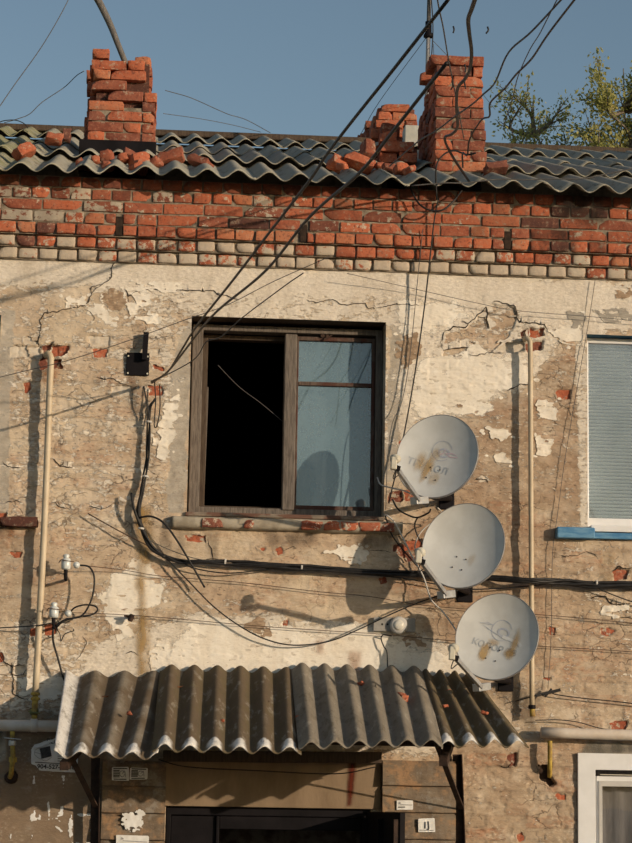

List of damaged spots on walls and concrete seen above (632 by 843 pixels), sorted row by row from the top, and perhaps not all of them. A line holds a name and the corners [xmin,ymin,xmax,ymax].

crack [31,263,238,347]
peeling [388,284,632,421]
peeling [147,383,183,460]
peeling [479,426,515,442]
peeling [485,452,514,467]
peeling [533,433,554,457]
peeling [323,543,369,565]
peeling [94,556,167,645]
water stain [138,575,147,675]
crack [0,654,28,700]